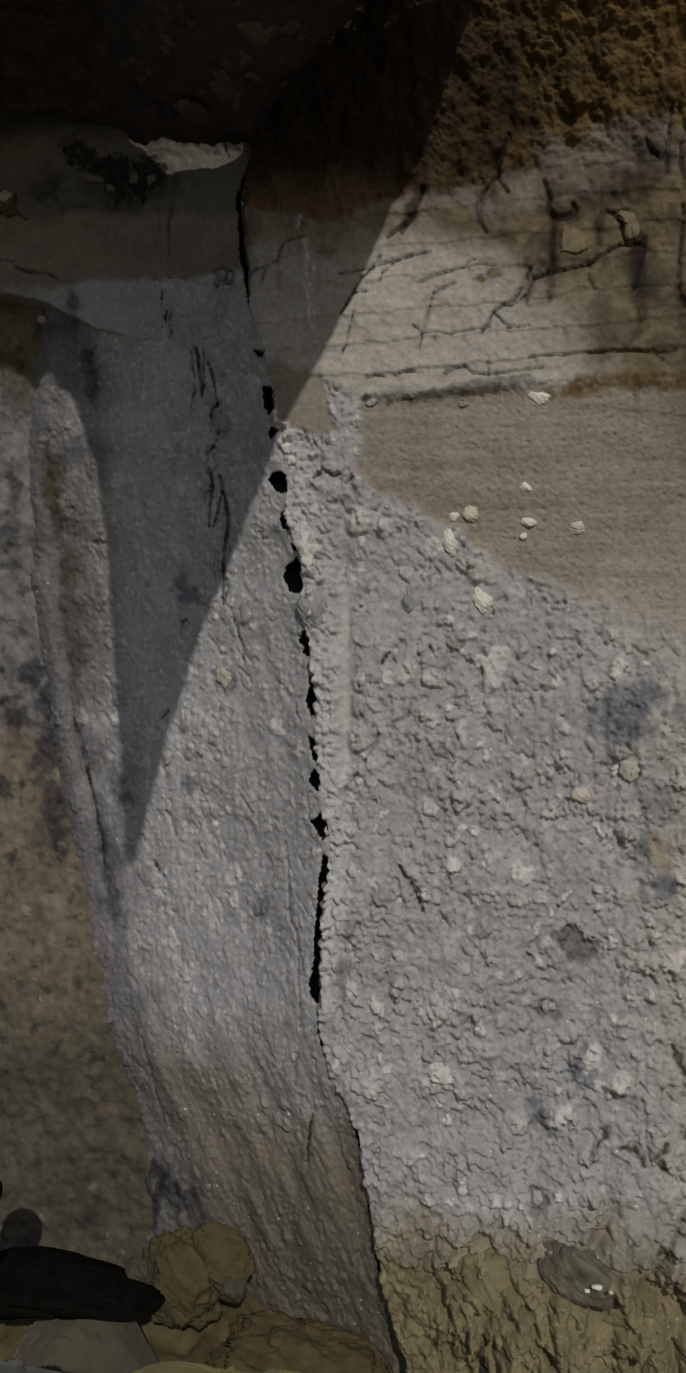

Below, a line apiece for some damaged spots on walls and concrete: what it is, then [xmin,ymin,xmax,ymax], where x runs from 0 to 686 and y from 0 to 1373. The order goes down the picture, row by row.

crack [224,142,251,306]
crack [340,188,427,354]
crack [482,183,644,330]
crack [253,350,279,439]
spalling [272,409,296,466]
spalling [294,530,319,566]
crack [267,471,353,593]
crack [298,631,331,1058]
crack [399,866,424,911]
spalling [552,922,600,962]
crack [339,1094,362,1151]
crack [367,1192,381,1277]